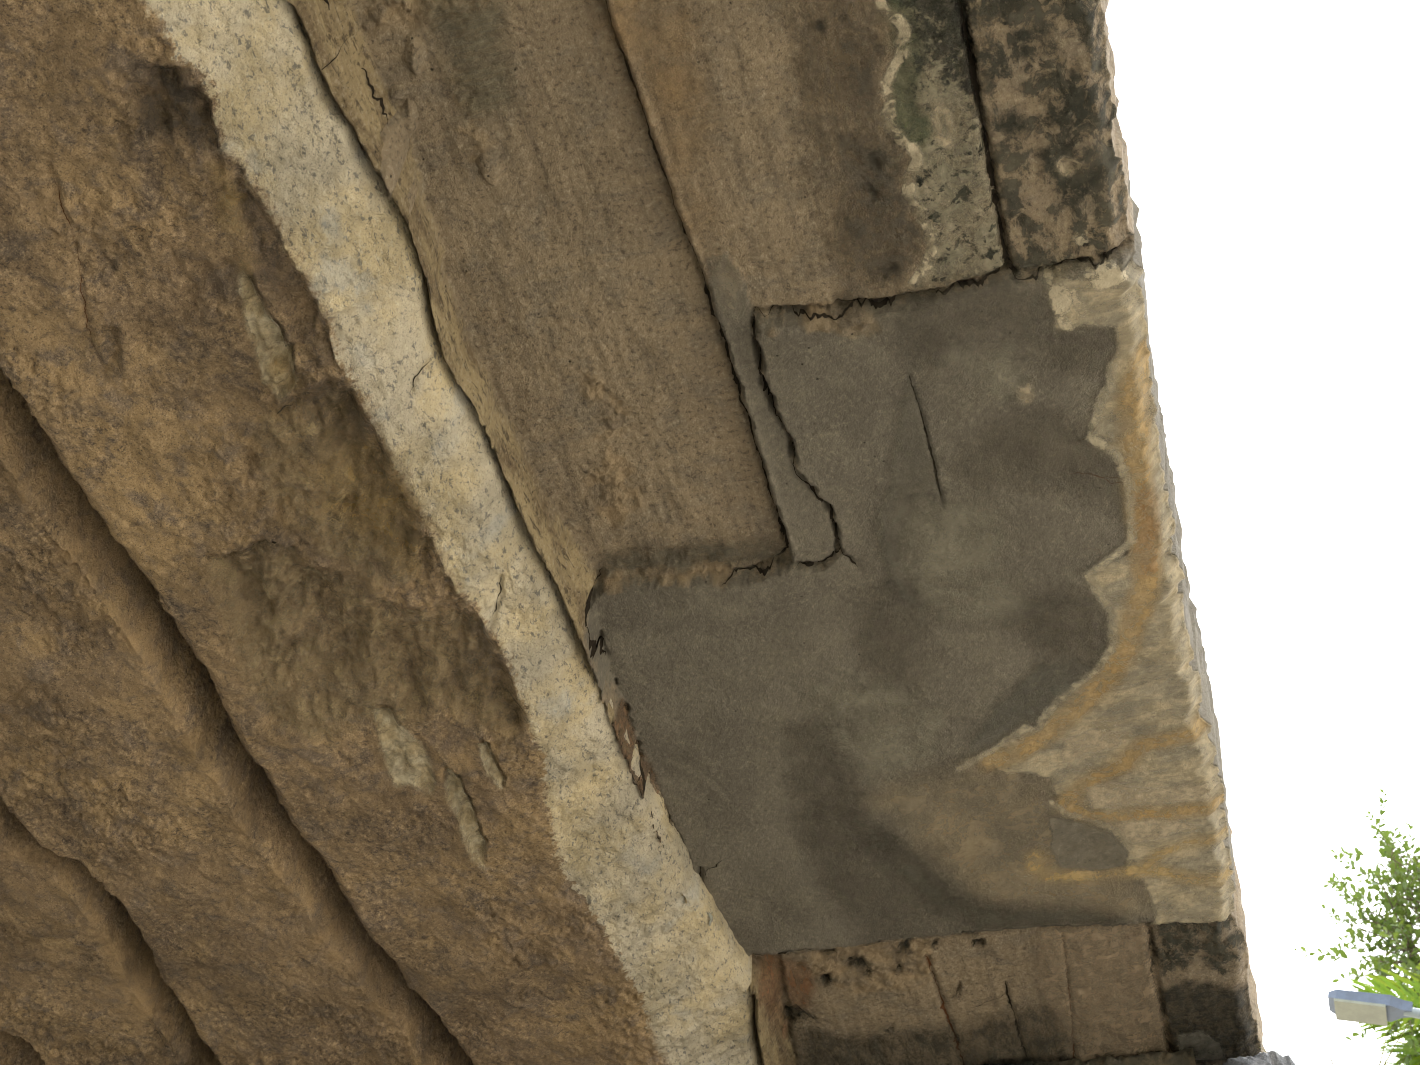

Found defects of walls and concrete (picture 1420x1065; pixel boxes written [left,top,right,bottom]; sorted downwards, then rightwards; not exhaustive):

crack [606,0,1128,584]
leakage [790,0,1262,1065]